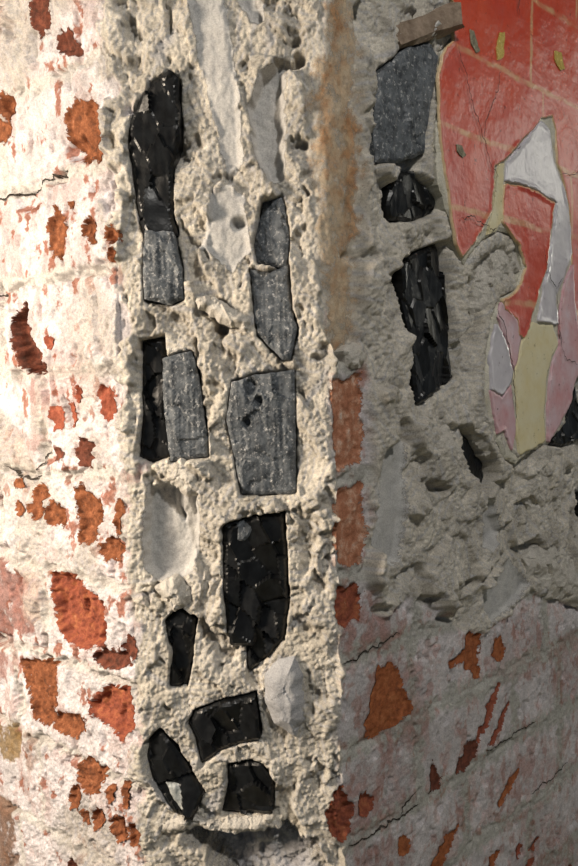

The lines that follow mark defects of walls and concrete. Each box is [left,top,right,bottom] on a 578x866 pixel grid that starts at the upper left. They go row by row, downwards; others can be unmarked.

crack [0,170,69,201]
rust [305,0,365,350]
spalling [9,301,55,375]
spalling [50,571,138,670]
crack [344,632,399,664]
spalling [448,631,483,679]
spalling [363,662,414,739]
spalling [456,682,510,775]
crack [487,722,535,751]
spalling [430,759,443,792]
spalling [325,785,374,843]
crack [349,791,418,846]